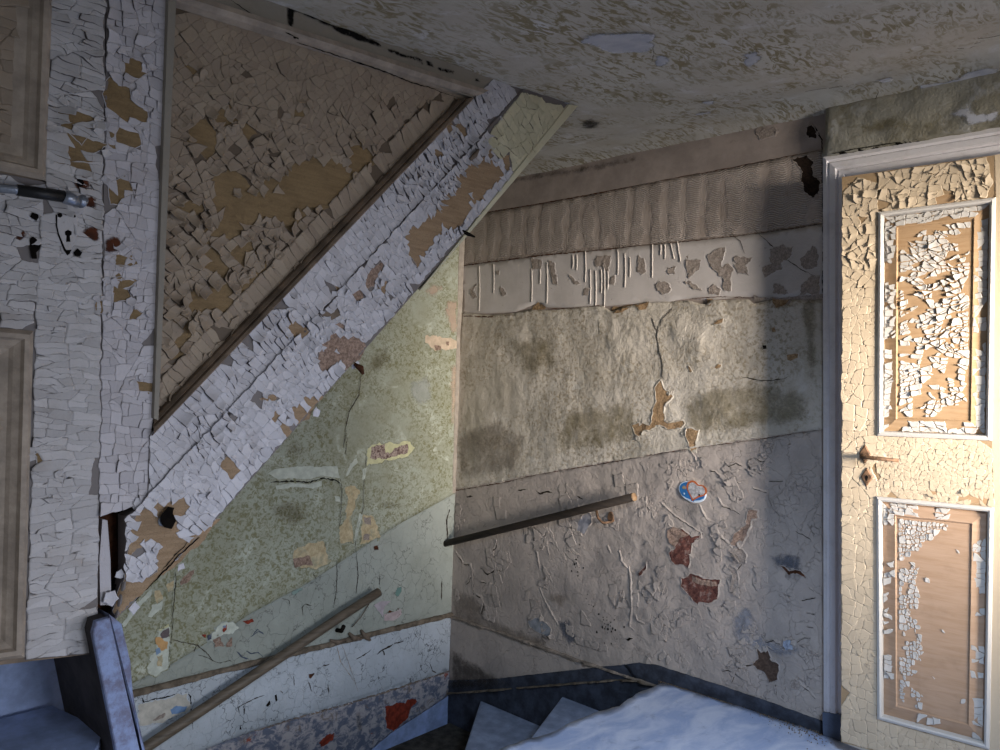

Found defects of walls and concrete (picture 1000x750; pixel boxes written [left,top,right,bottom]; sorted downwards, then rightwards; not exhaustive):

peeling [582,33,668,66]
peeling [405,147,512,267]
flaking render [792,154,823,200]
spalling [655,247,754,296]
peeling [0,0,471,659]
crack [652,310,670,379]
spalling [631,379,700,453]
peeling [840,157,995,750]
peeling [523,483,620,576]
spalling [667,508,759,605]
peeling [524,565,639,652]
spalling [752,642,780,683]